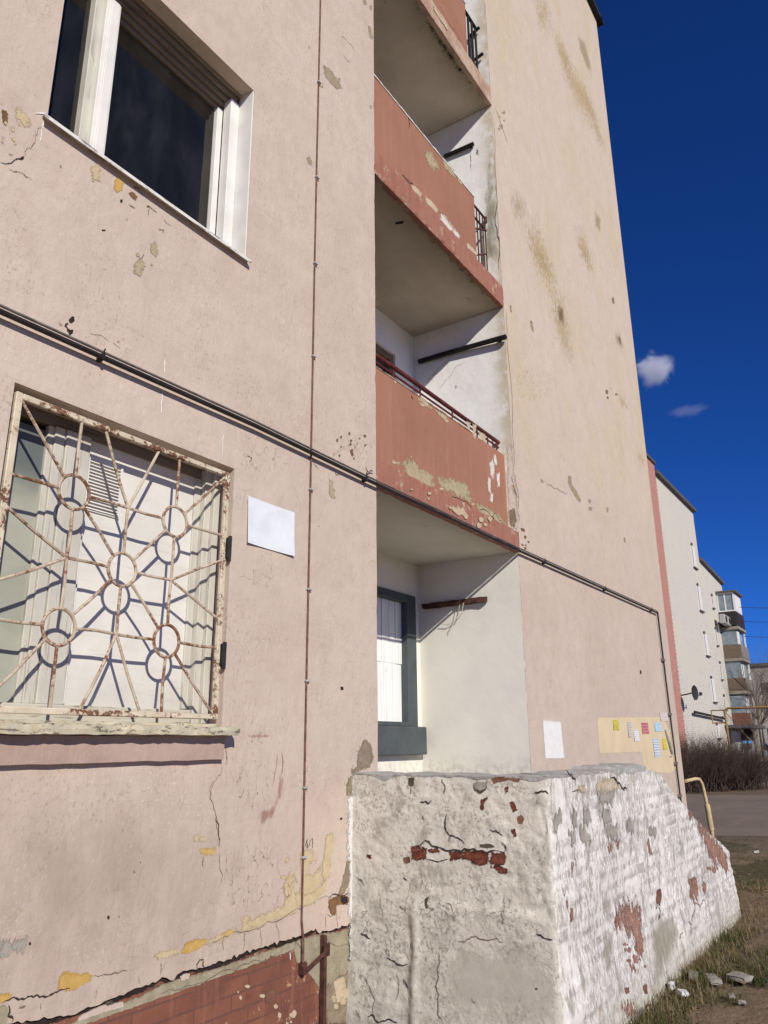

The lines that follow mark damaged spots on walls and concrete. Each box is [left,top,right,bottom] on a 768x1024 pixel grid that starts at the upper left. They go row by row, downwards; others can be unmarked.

crack [4,126,43,179]
peeling [392,456,493,528]
flaking render [346,740,374,796]
crack [210,752,269,882]
crack [420,800,465,845]
flaking render [403,840,507,874]
flaking render [688,810,729,904]
flaking render [11,831,350,1024]
crack [196,896,333,966]
crack [357,877,512,1023]
flaking render [614,895,646,973]
crack [3,988,70,1022]